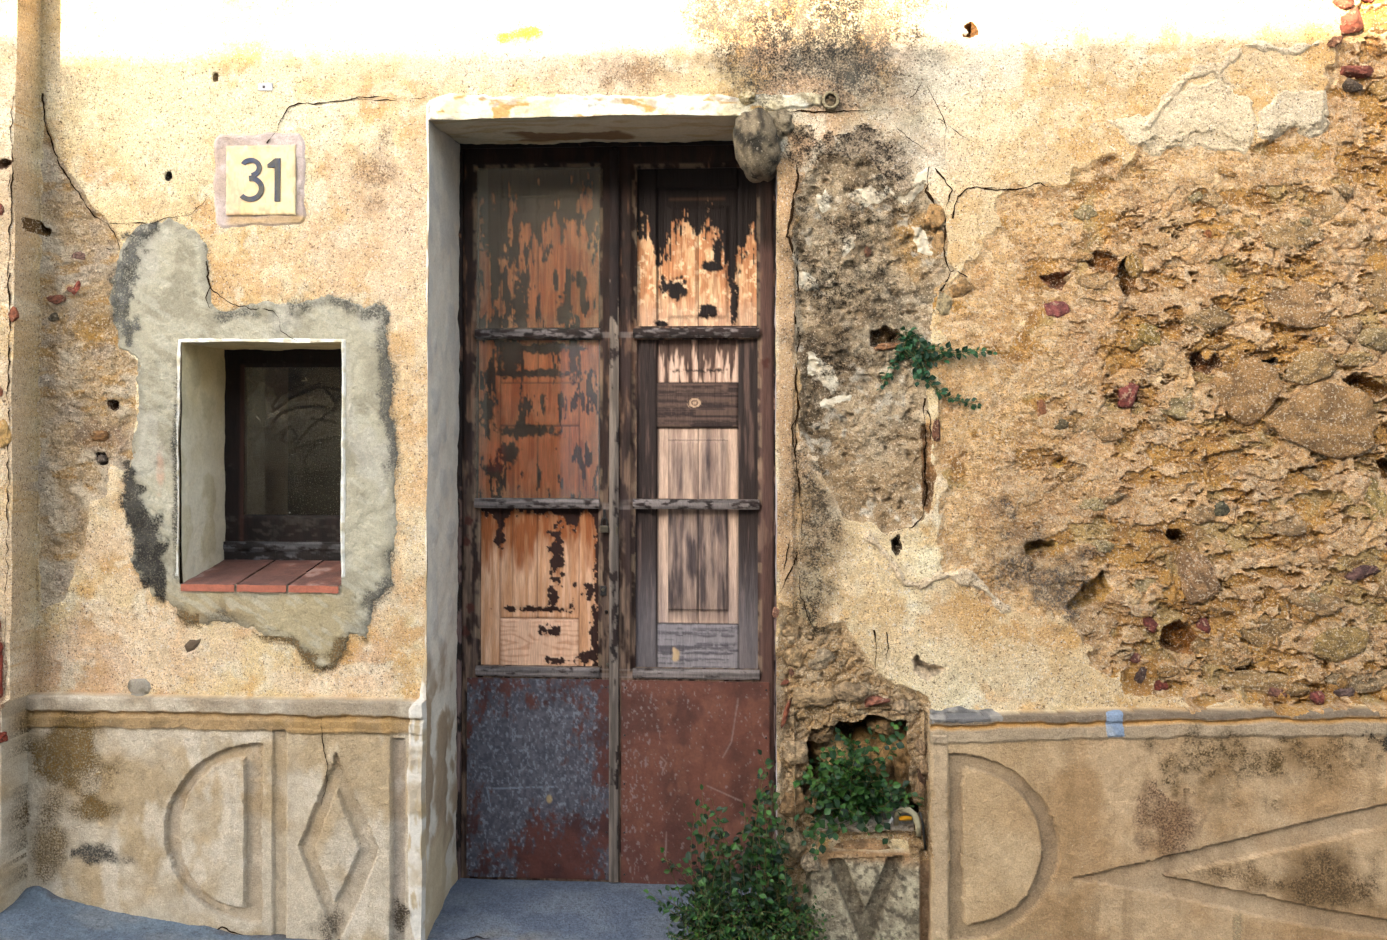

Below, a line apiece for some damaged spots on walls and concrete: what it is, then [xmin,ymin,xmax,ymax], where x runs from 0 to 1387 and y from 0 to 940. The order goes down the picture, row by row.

crack [4,93,211,653]
crack [266,96,424,144]
water stain [680,0,943,426]
crack [766,86,1054,312]
spalling [792,0,1387,720]
water stain [12,709,133,881]